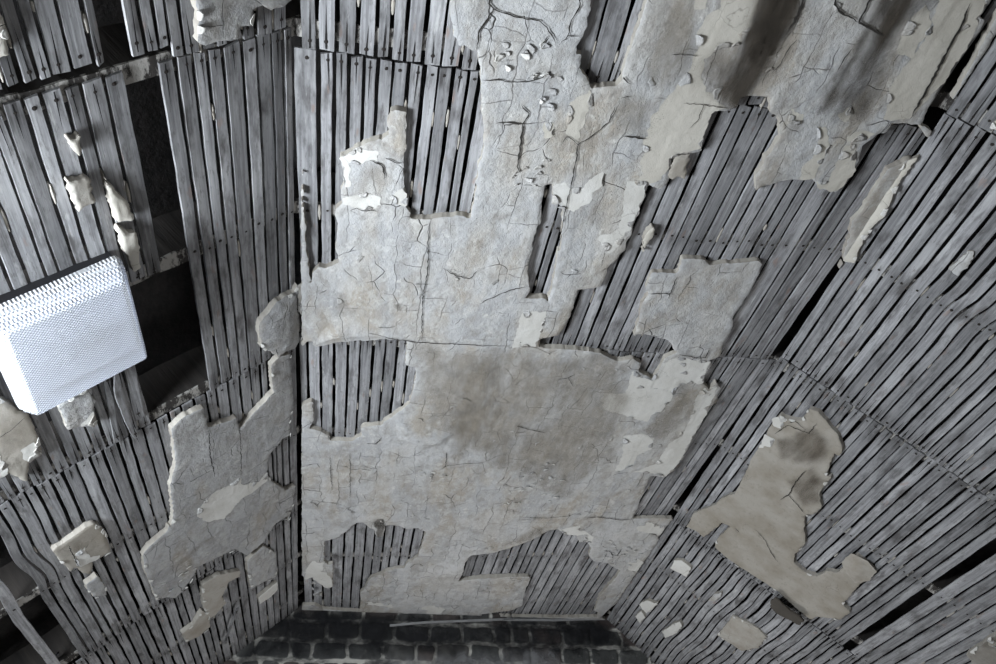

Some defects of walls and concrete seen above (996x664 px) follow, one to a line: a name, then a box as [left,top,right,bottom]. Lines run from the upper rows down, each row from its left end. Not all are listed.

crack [477,0,581,45]
water stain [721,0,796,106]
crack [772,0,804,73]
crack [834,0,884,36]
water stain [869,0,912,71]
crack [484,72,550,173]
crack [558,77,643,250]
spalling [0,0,484,664]
spalling [460,0,996,664]